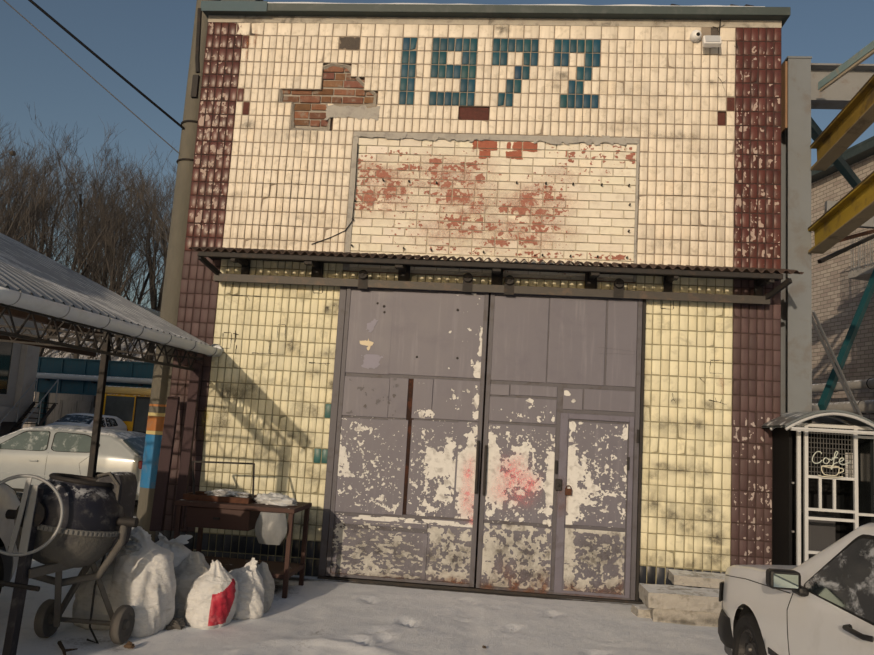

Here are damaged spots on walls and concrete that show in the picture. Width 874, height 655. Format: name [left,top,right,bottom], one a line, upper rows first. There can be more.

spalling [189,22,255,235]
spalling [279,63,377,131]
peeling [355,140,635,263]
spalling [718,46,780,264]
peeling [314,448,328,463]
peeling [331,319,483,583]
peeling [482,398,555,591]
peeling [563,421,628,593]
spalling [733,417,772,465]
spalling [734,481,772,565]